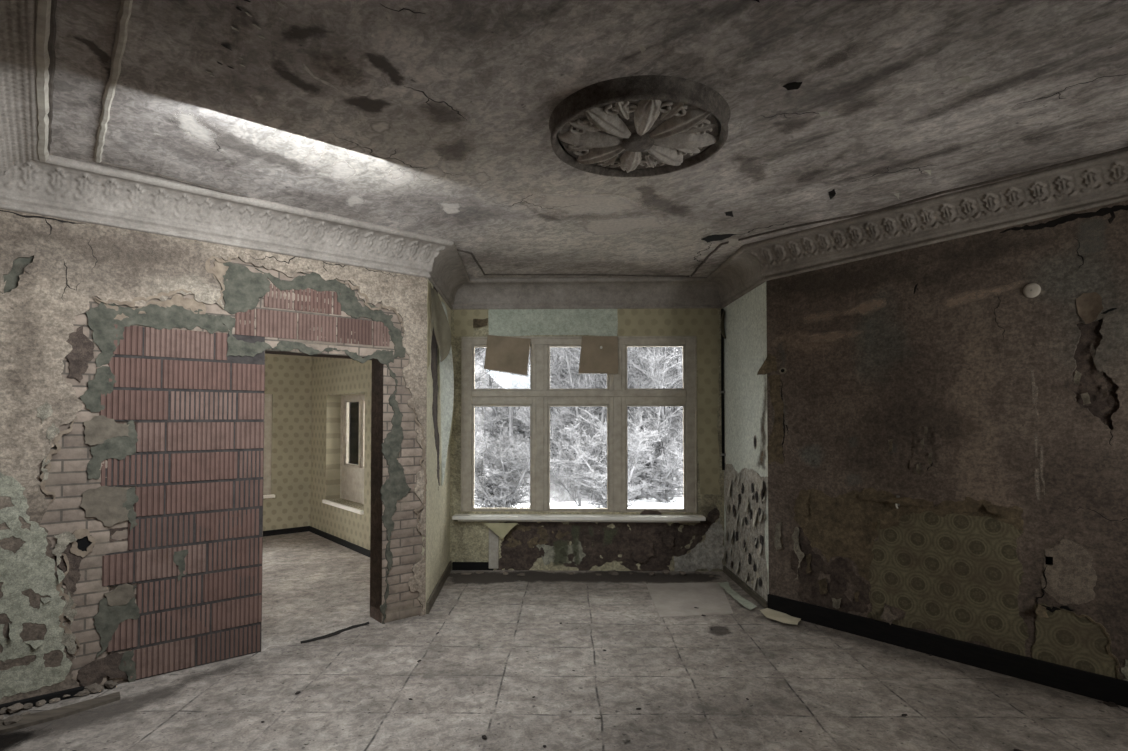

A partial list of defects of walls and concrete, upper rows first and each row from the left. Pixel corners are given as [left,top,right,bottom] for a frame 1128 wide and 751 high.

water stain [283,26,328,41]
water stain [274,53,404,132]
water stain [179,113,211,142]
water stain [265,118,284,129]
water stain [332,147,363,179]
water stain [384,168,444,186]
water stain [347,193,363,206]
water stain [440,203,460,214]
water stain [542,193,667,234]
spalling [1068,292,1120,446]
spalling [0,256,440,700]
spalling [497,464,871,613]